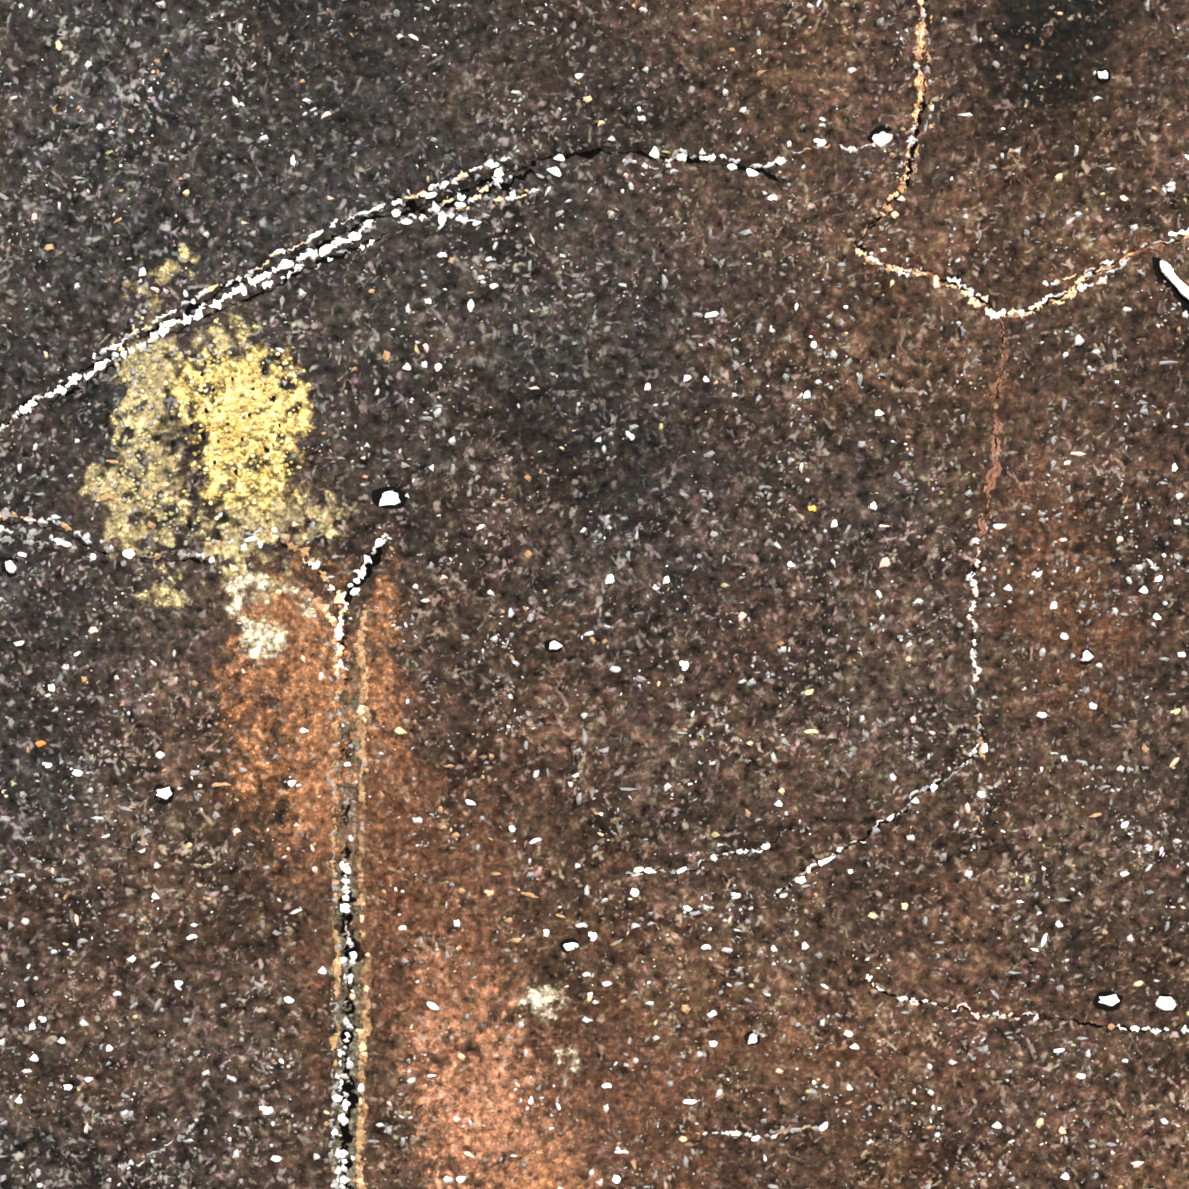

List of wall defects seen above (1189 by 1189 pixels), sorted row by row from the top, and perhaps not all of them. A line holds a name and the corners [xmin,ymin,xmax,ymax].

crack [0,136,876,433]
crack [773,0,1189,900]
crack [0,507,389,1189]
rust [216,557,701,1189]
crack [625,827,810,877]
rust [705,1021,865,1075]